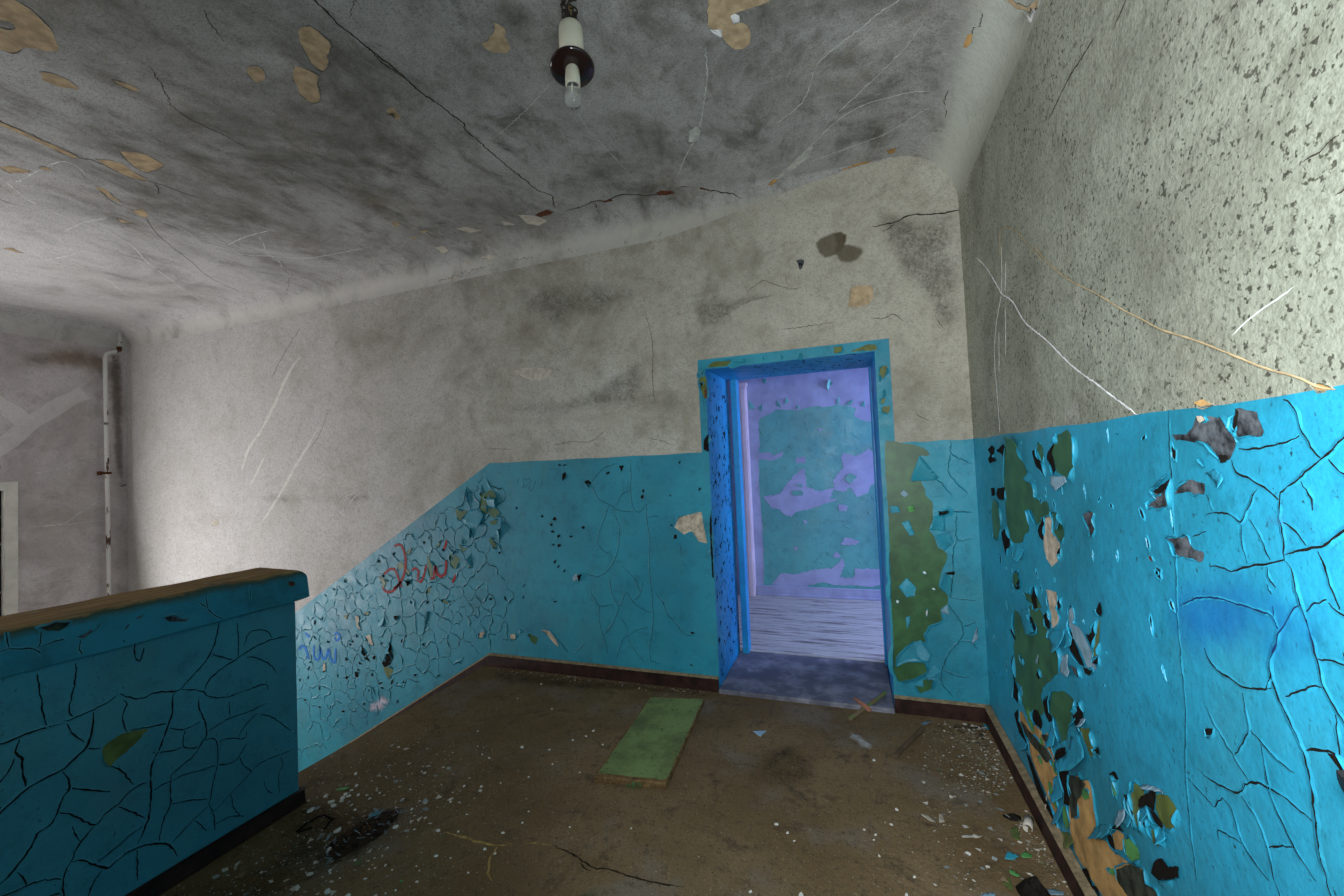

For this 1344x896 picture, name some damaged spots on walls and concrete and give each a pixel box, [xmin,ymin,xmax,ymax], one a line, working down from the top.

crack [313,0,953,211]
peeling [711,14,740,38]
water stain [817,233,861,261]
crack [0,449,515,896]
peeling [299,478,518,713]
peeling [510,629,569,654]
peeling [540,514,586,583]
peeling [670,344,955,695]
peeling [972,430,1181,896]
crack [976,257,1344,896]
peeling [1204,727,1215,739]